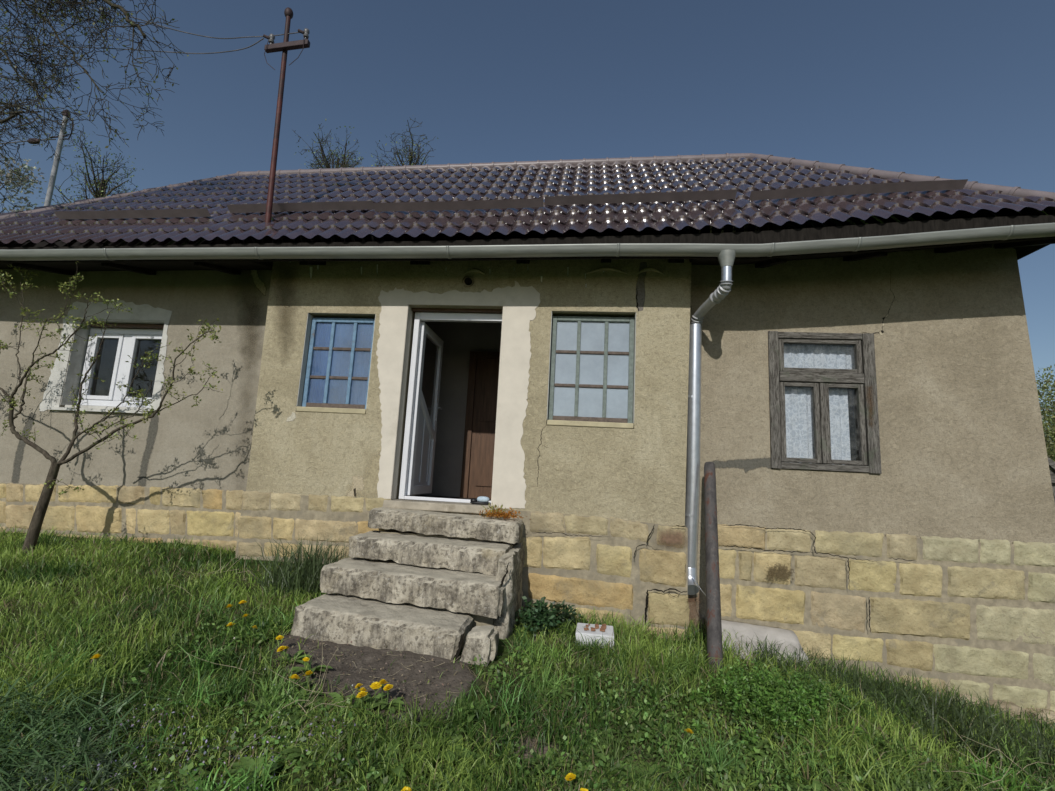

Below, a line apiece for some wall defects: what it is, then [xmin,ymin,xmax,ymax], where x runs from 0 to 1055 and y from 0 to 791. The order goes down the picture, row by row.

crack [634,525,686,555]
crack [644,588,687,623]